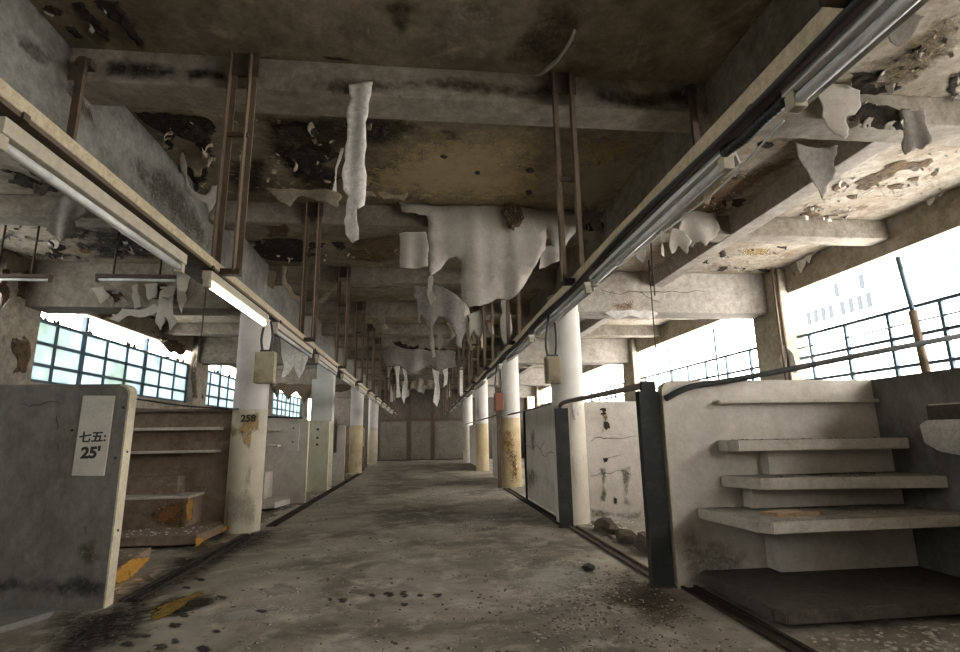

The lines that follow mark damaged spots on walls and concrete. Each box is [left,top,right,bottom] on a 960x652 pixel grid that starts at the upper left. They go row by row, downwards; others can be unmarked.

damp [109,61,173,77]
damp [188,69,224,79]
damp [438,81,550,96]
damp [598,91,688,108]
peeling [785,16,960,222]
spalling [134,112,220,213]
peeling [660,141,774,257]
peeling [249,81,604,406]
spalling [0,269,29,311]
peeling [91,273,190,356]
spalling [11,336,31,374]
rust [504,432,518,479]